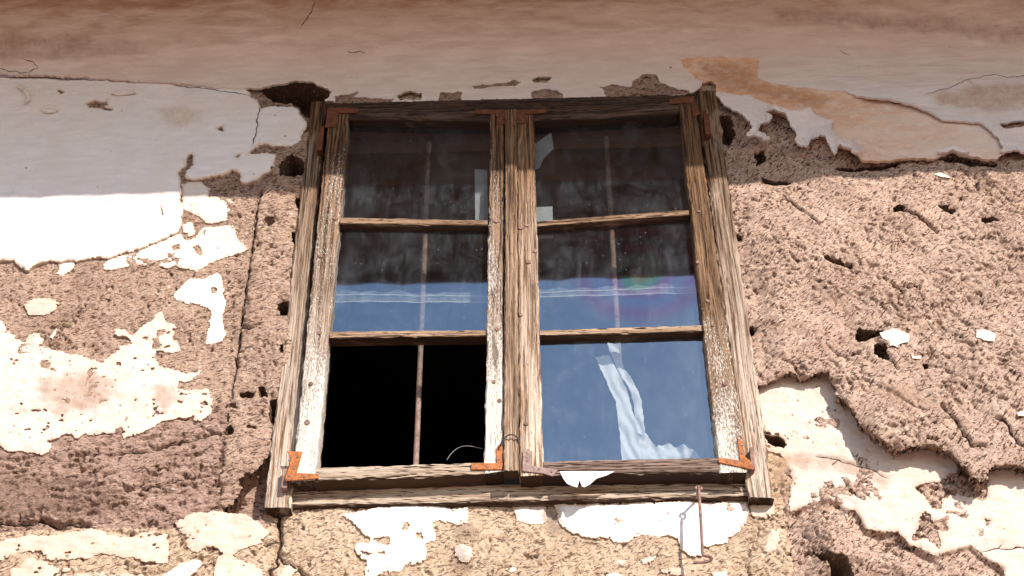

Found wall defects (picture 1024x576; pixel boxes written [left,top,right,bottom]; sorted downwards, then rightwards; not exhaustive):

spalling [0,196,260,456]
peeling [0,75,308,273]
crack [232,200,260,390]
spalling [214,112,310,513]
spalling [233,56,1024,576]
spalling [0,403,271,576]